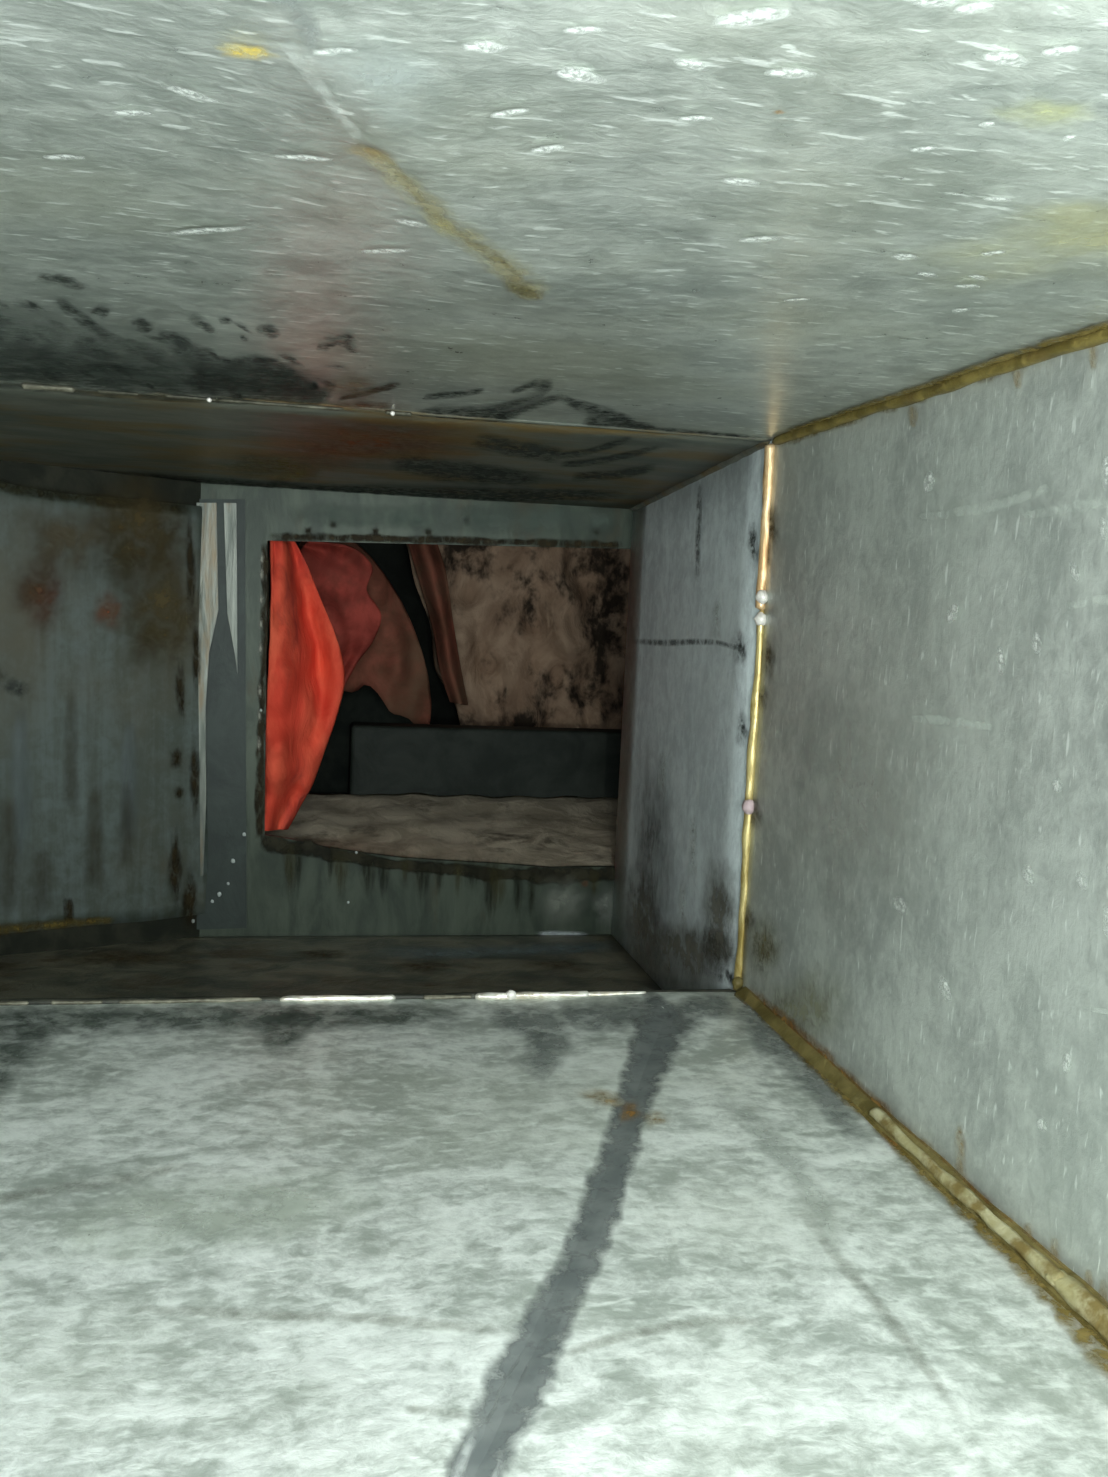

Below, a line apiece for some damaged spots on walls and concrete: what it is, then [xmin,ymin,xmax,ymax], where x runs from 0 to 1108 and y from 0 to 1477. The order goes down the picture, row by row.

water stain [0,276,299,396]
rust [0,480,182,513]
rust [187,531,195,596]
rust [176,631,200,711]
rust [172,750,199,806]
rust [169,842,196,922]